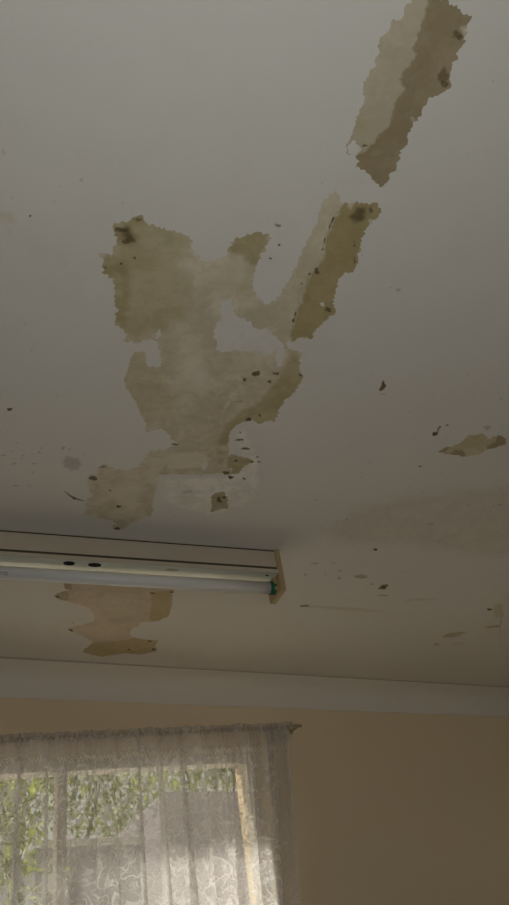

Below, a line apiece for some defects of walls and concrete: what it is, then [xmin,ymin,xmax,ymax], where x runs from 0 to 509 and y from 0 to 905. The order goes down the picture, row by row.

peeling [346,0,472,187]
peeling [83,191,381,530]
peeling [438,425,506,457]
peeling [55,583,174,660]